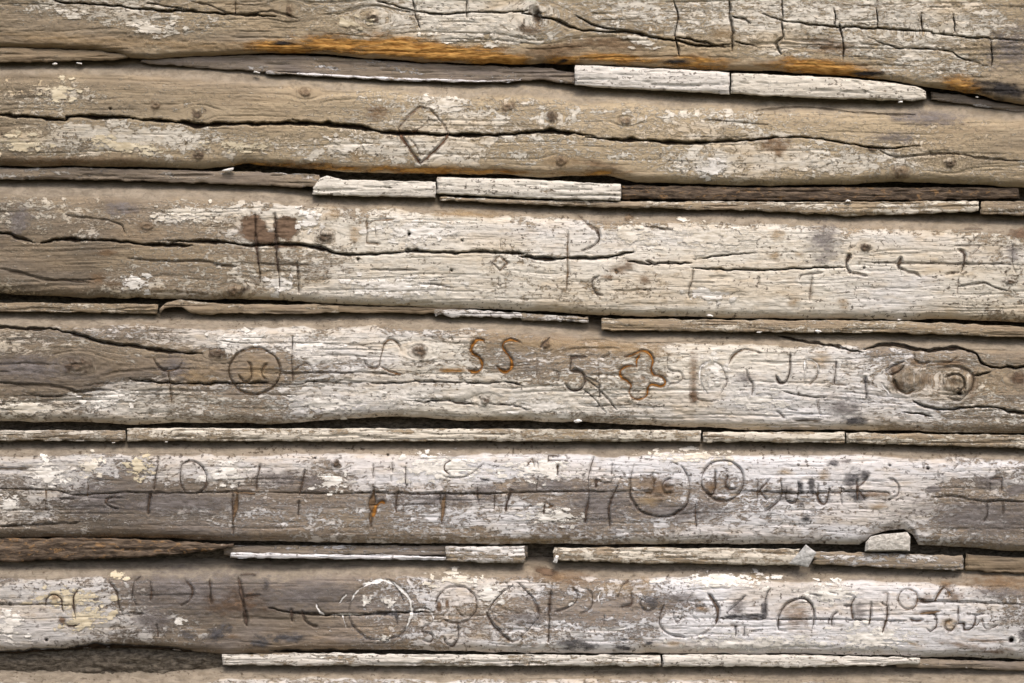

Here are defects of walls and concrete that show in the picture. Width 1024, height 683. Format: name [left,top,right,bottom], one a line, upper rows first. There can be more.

crack [55,0,294,18]
crack [378,0,1008,64]
crack [0,106,1017,161]
crack [0,215,845,288]
crack [0,326,197,354]
crack [779,336,1024,376]
peeling [307,469,358,496]
peeling [393,448,586,486]
peeling [515,502,585,529]
peeling [422,566,508,605]
peeling [650,545,861,608]
peeling [658,618,918,656]